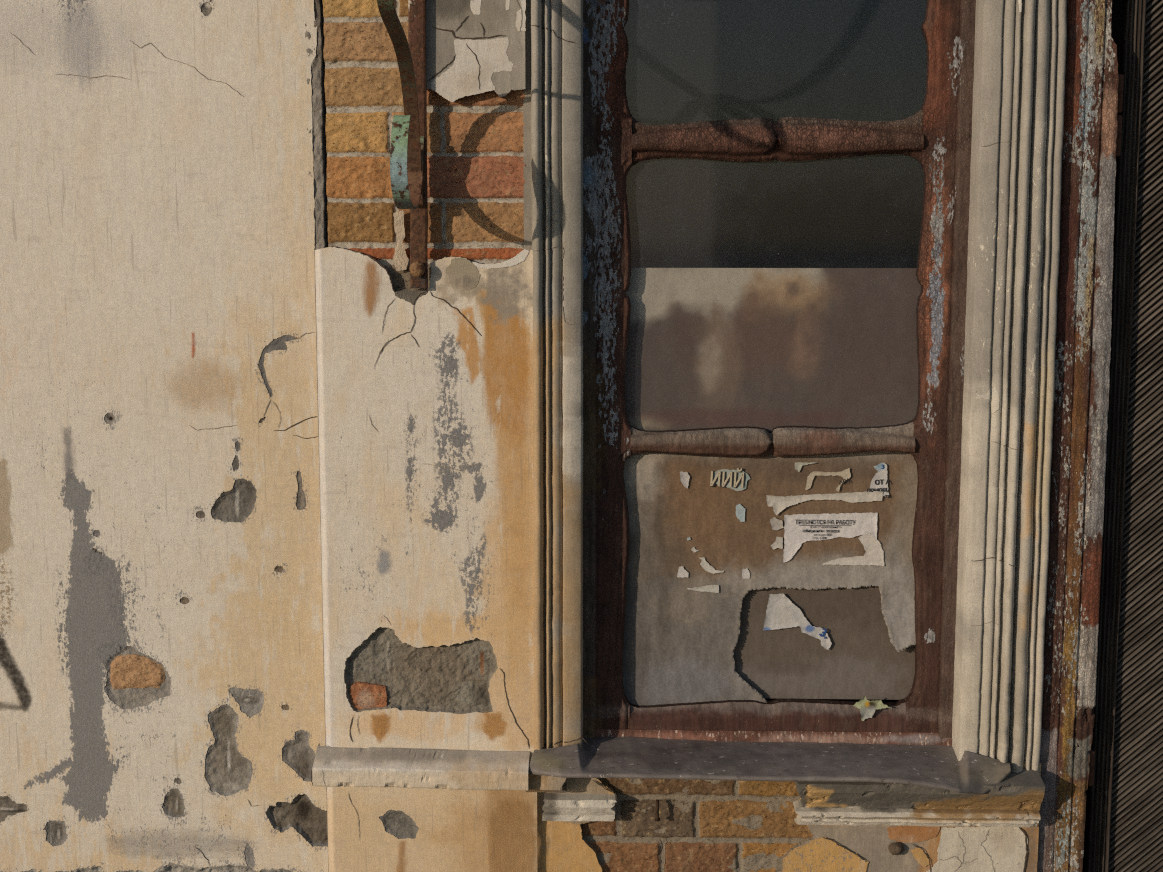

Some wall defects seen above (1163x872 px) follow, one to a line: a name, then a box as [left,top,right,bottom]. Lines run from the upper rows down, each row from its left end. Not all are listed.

peeling [431,0,526,102]
crack [429,0,575,89]
crack [374,290,480,370]
spalling [196,441,257,522]
peeling [24,433,171,846]
spalling [344,534,498,714]
spalling [0,796,27,823]
spalling [204,687,264,796]
spalling [266,730,328,846]
flaking render [581,778,869,872]
peeling [887,826,1028,872]